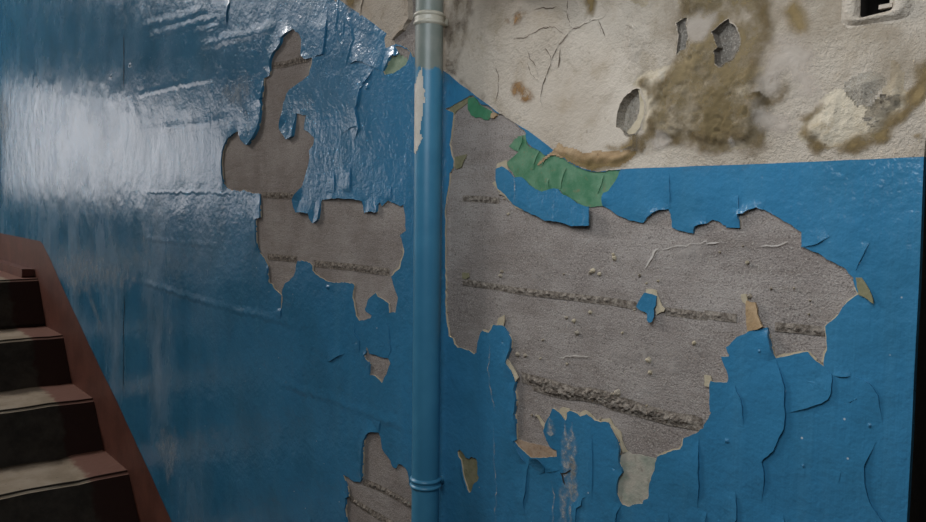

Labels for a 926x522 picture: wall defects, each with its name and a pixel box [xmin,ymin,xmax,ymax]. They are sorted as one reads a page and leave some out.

peeling [216,6,406,320]
peeling [334,0,416,140]
peeling [414,67,425,154]
crack [512,0,610,110]
spalling [616,87,646,137]
spalling [676,17,689,56]
water stain [560,0,809,171]
spalling [711,17,741,68]
water stain [802,116,823,151]
water stain [844,64,926,151]
peeling [446,96,874,507]
peeling [337,419,412,522]